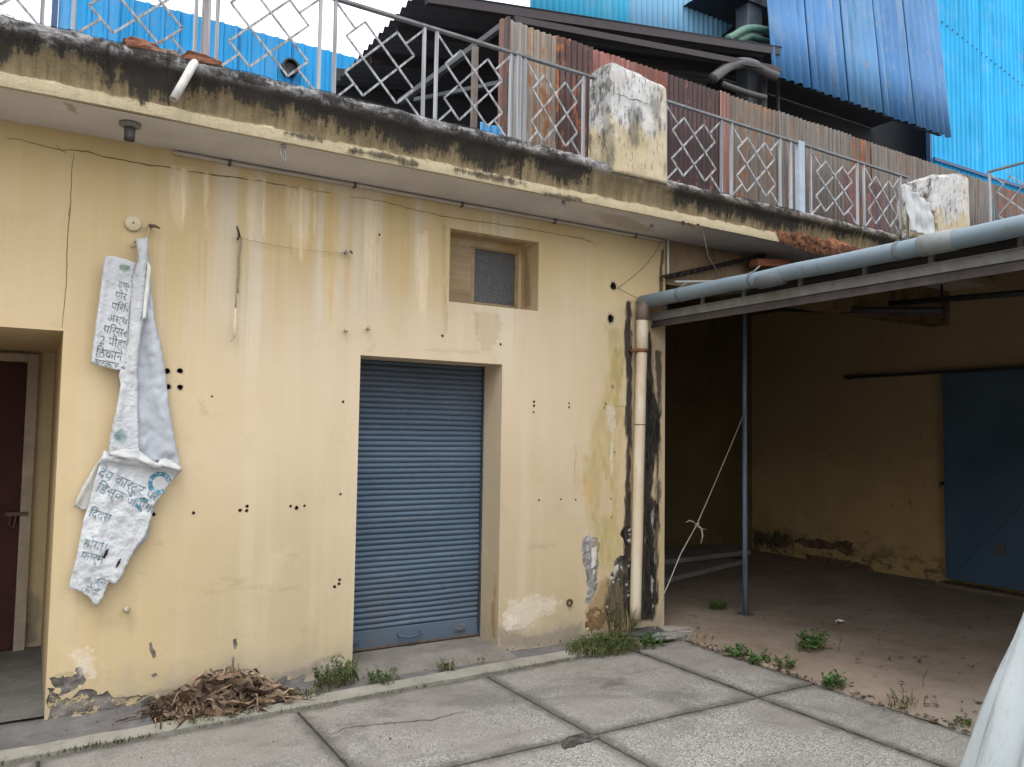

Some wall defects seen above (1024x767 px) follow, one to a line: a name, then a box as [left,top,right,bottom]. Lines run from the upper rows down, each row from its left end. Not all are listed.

mould [349,148,418,167]
mould [455,168,525,185]
water stain [545,192,582,202]
crack [7,138,330,325]
water stain [604,301,662,627]
peeling [582,527,632,631]
flaking render [46,667,163,719]